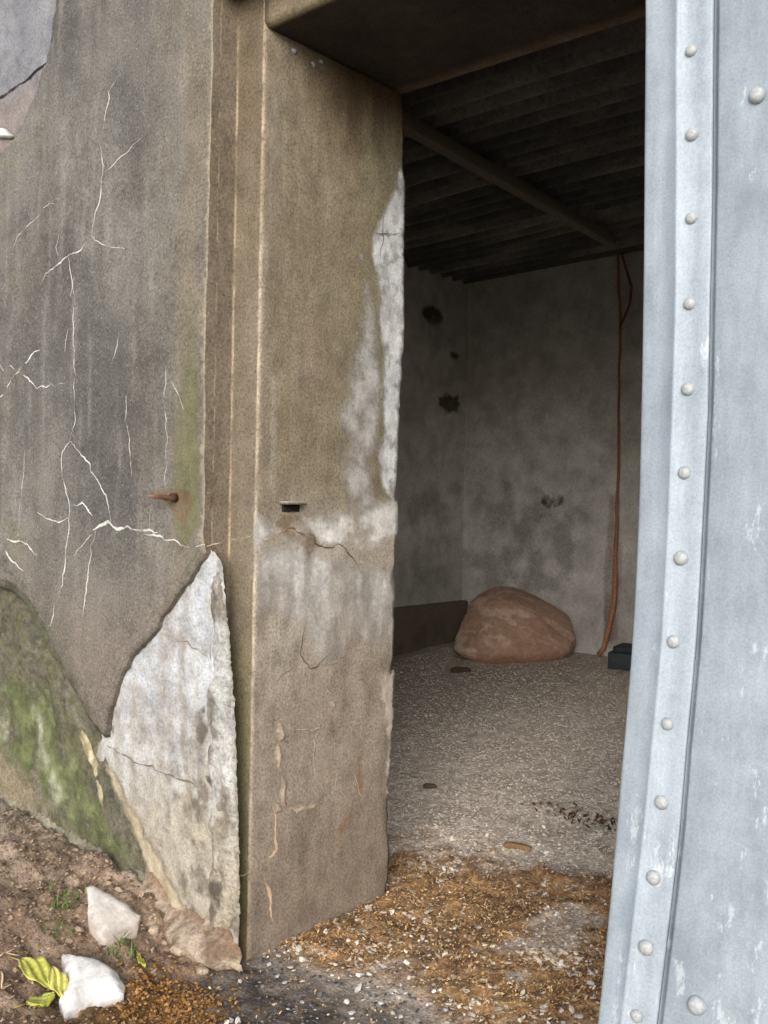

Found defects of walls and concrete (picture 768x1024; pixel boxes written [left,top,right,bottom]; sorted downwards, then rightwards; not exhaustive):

crack [0,63,46,99]
crack [0,82,367,626]
spalling [0,550,240,945]
crack [279,616,330,679]